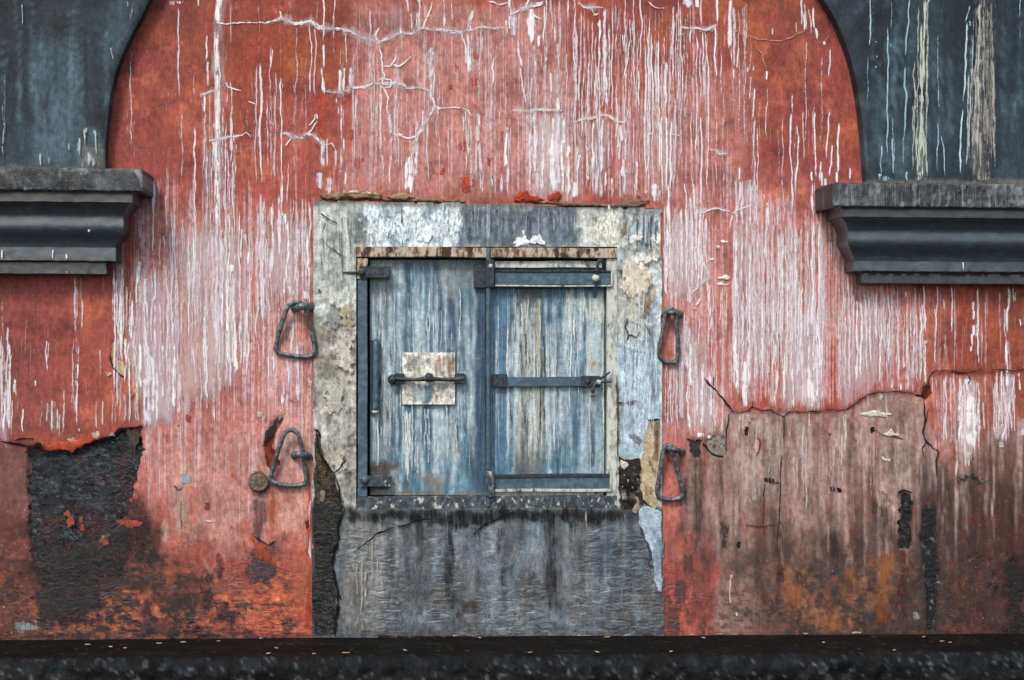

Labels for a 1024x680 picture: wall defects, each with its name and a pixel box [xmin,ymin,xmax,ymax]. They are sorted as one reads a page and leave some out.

crack [209,132,250,143]
crack [216,0,544,162]
crack [513,108,624,123]
spalling [27,426,156,583]
spalling [312,429,347,634]
peeling [317,288,355,415]
crack [316,431,433,637]
leakage [348,505,627,610]
peeling [618,419,663,592]
crack [704,368,1018,540]
peeling [860,395,903,439]
leakage [914,505,939,630]